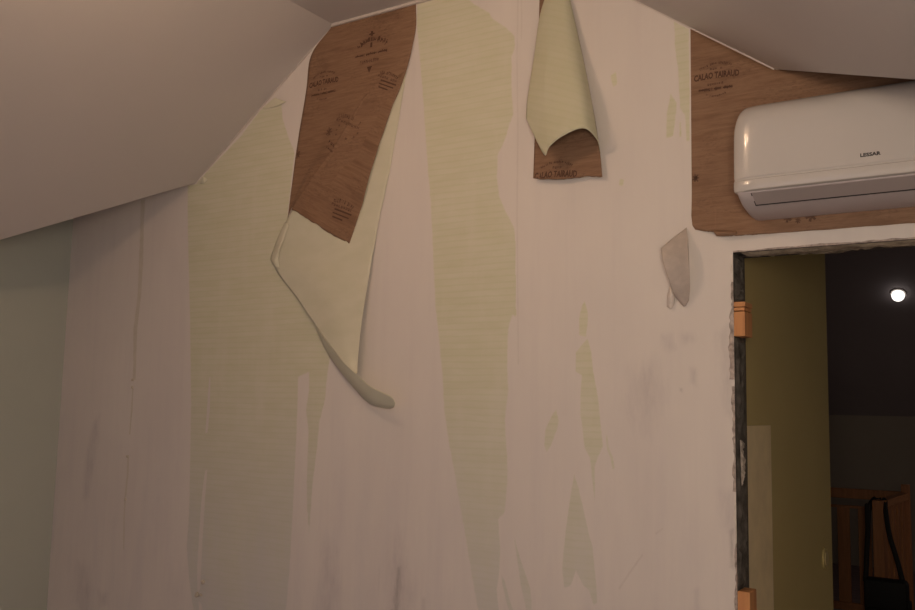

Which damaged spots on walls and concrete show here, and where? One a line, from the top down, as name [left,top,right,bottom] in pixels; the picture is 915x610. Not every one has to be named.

peeling [185,97,333,610]
peeling [415,0,521,610]